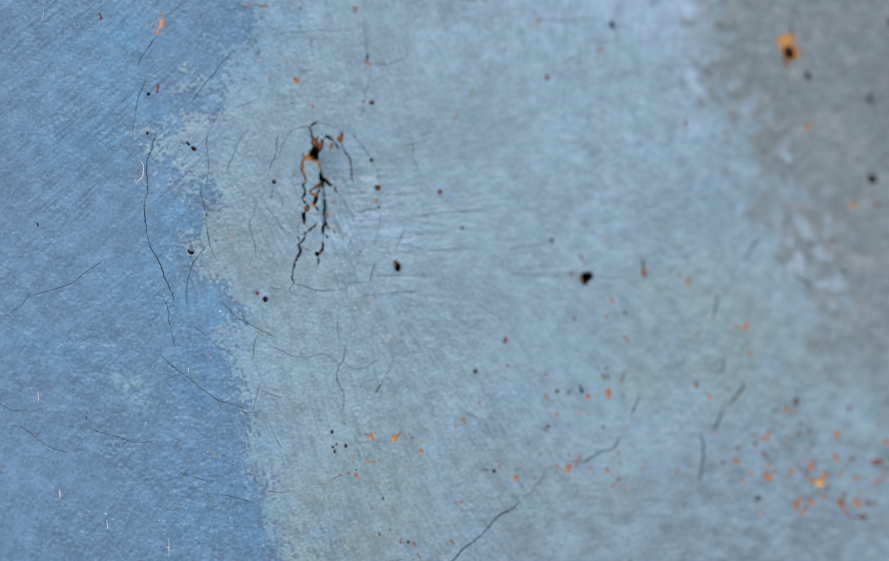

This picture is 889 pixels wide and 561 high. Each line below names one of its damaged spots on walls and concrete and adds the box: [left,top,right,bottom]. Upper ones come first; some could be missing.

crack [144,100,280,445]
crack [222,296,393,410]
crack [248,26,483,296]